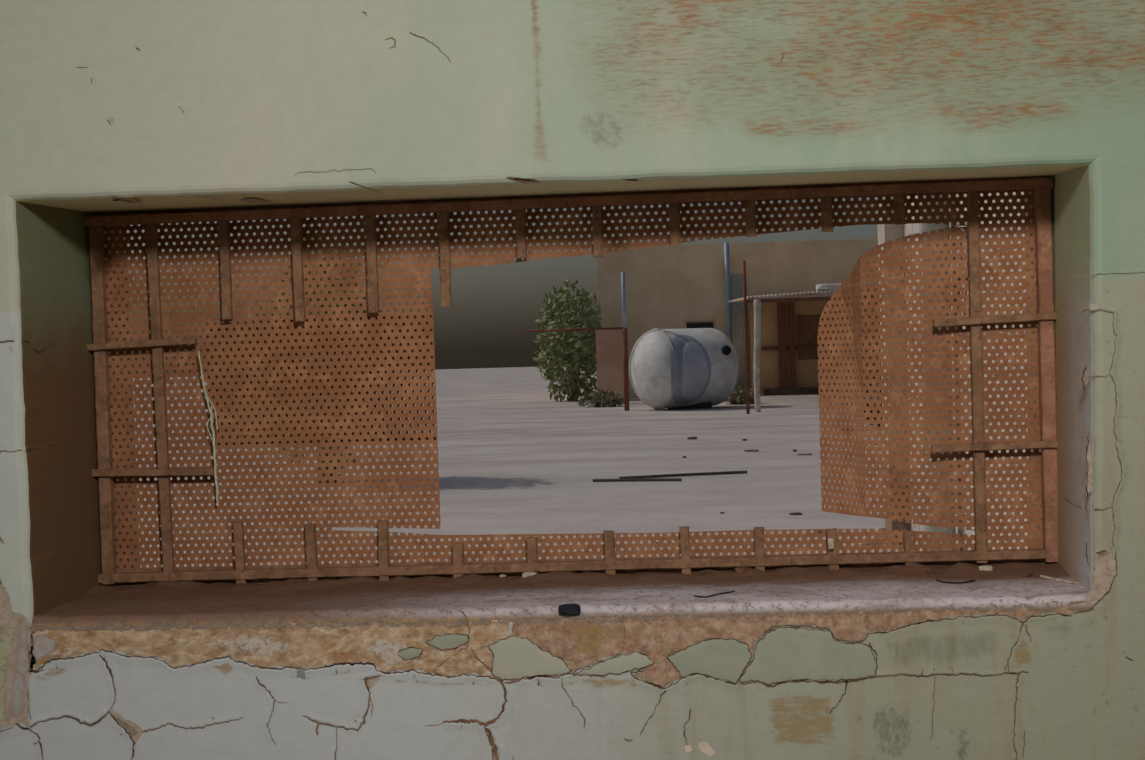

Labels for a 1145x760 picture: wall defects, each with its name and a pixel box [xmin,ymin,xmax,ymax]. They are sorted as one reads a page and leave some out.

crack [1063,303,1129,566]
crack [27,655,116,760]
peeling [104,709,143,760]
crack [141,667,385,760]
crack [427,611,586,760]
peeling [0,544,1118,740]
crack [624,690,691,745]
crack [738,623,1031,760]